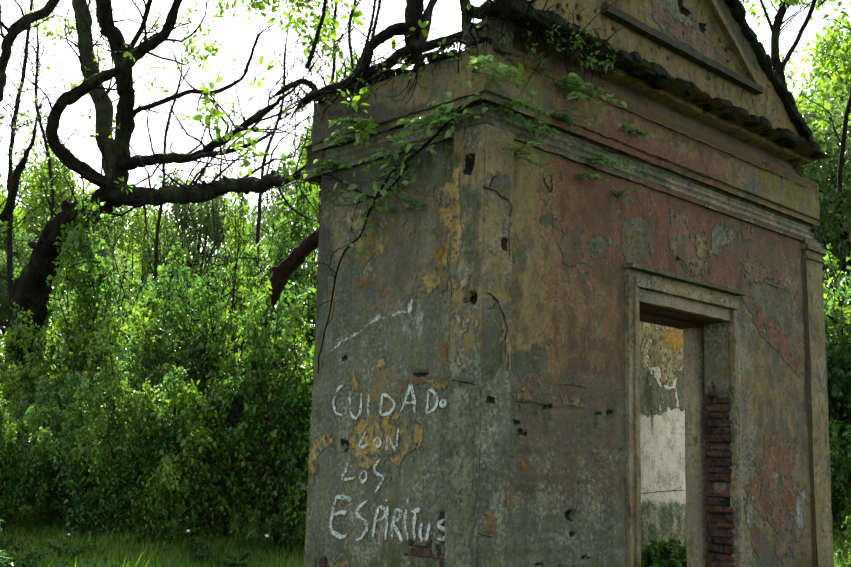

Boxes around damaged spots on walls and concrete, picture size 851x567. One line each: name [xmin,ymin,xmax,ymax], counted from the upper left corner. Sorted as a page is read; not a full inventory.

peeling [651,0,731,63]
crack [483,175,512,260]
peeling [585,214,654,263]
peeling [666,209,740,281]
peeling [739,251,805,377]
peeling [348,369,477,567]
flaking render [705,380,734,567]
peeling [743,431,808,558]